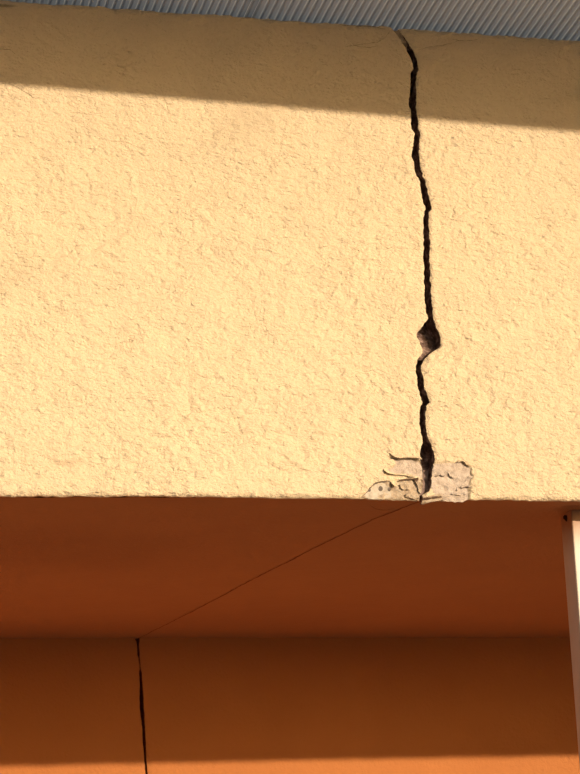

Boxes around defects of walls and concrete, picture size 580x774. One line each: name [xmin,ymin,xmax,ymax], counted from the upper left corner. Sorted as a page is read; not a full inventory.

crack [135,25,472,774]
flaking render [362,453,473,505]